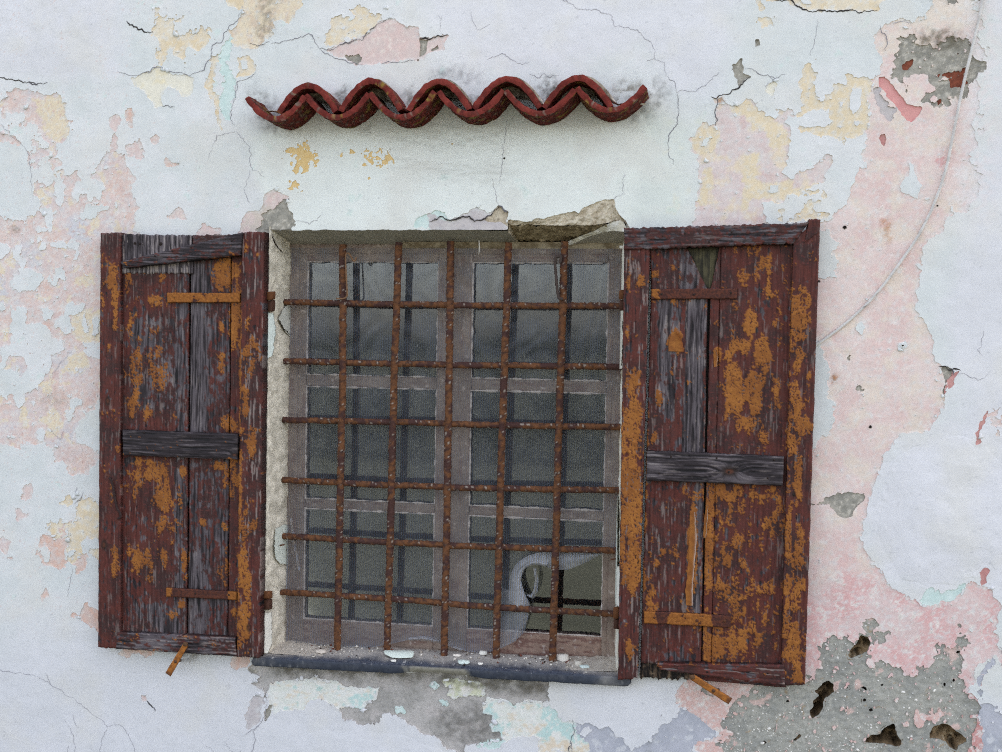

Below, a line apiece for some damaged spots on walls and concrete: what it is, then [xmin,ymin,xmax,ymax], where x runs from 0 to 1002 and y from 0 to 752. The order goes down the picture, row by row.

crack [0,77,47,85]
crack [563,0,784,162]
peeling [0,88,160,476]
peeling [226,0,1002,752]
peeling [36,492,99,575]
crack [2,671,135,752]
crack [211,686,268,752]